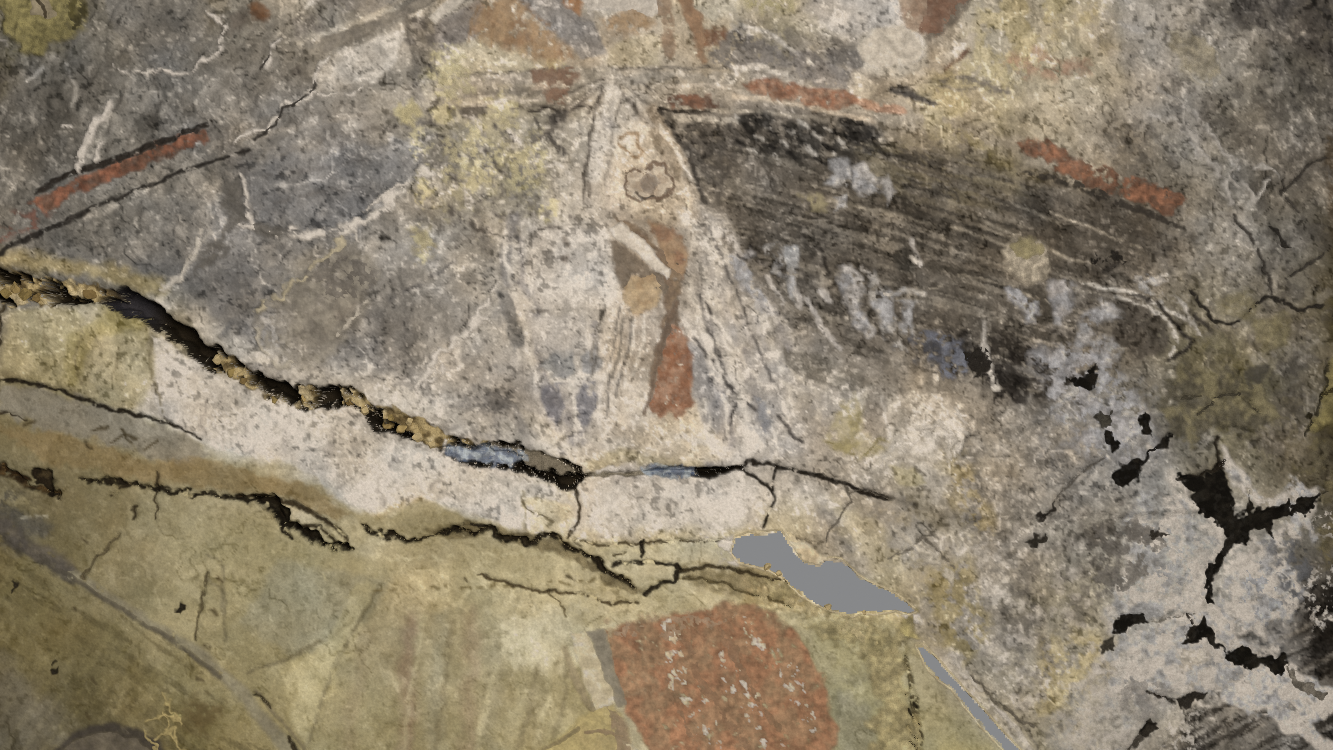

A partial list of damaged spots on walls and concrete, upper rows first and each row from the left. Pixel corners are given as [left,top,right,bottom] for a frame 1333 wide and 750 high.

crack [1280,157,1327,213]
crack [1189,214,1324,325]
crack [0,267,892,616]
crack [176,572,208,640]
spalling [718,529,923,623]
crack [888,536,955,569]
peeling [891,525,954,583]
peeling [1101,436,1333,700]
crack [288,736,297,750]
spalling [914,642,1035,750]